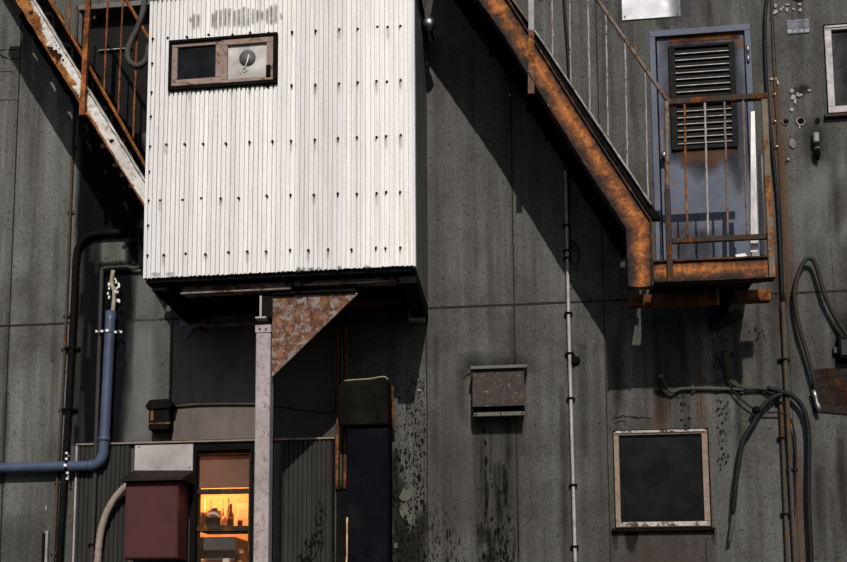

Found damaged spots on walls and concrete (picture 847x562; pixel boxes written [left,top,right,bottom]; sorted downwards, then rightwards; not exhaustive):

water stain [392,378,465,562]